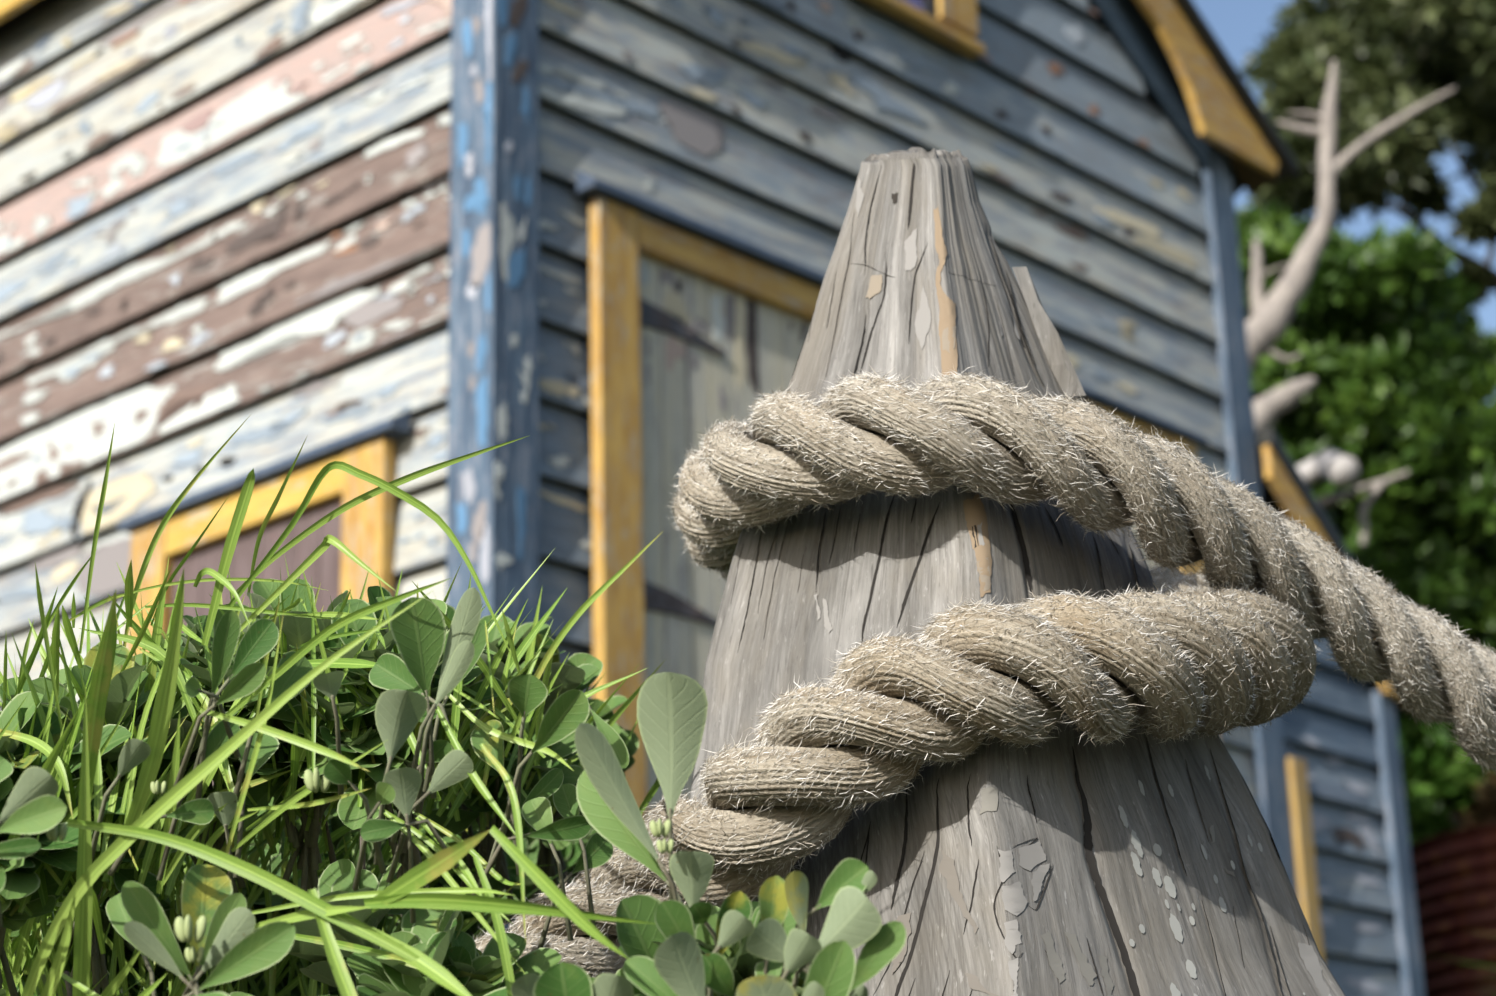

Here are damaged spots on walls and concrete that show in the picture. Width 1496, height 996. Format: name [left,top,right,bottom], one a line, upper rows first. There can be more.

peeling [0,56,55,102]
peeling [254,34,285,60]
peeling [310,0,365,28]
peeling [312,34,371,82]
peeling [387,13,452,50]
peeling [539,65,630,117]
peeling [1064,22,1087,45]
peeling [72,79,309,199]
peeling [363,112,451,184]
peeling [0,185,450,516]
crack [860,747,1140,996]
crack [1146,737,1309,996]